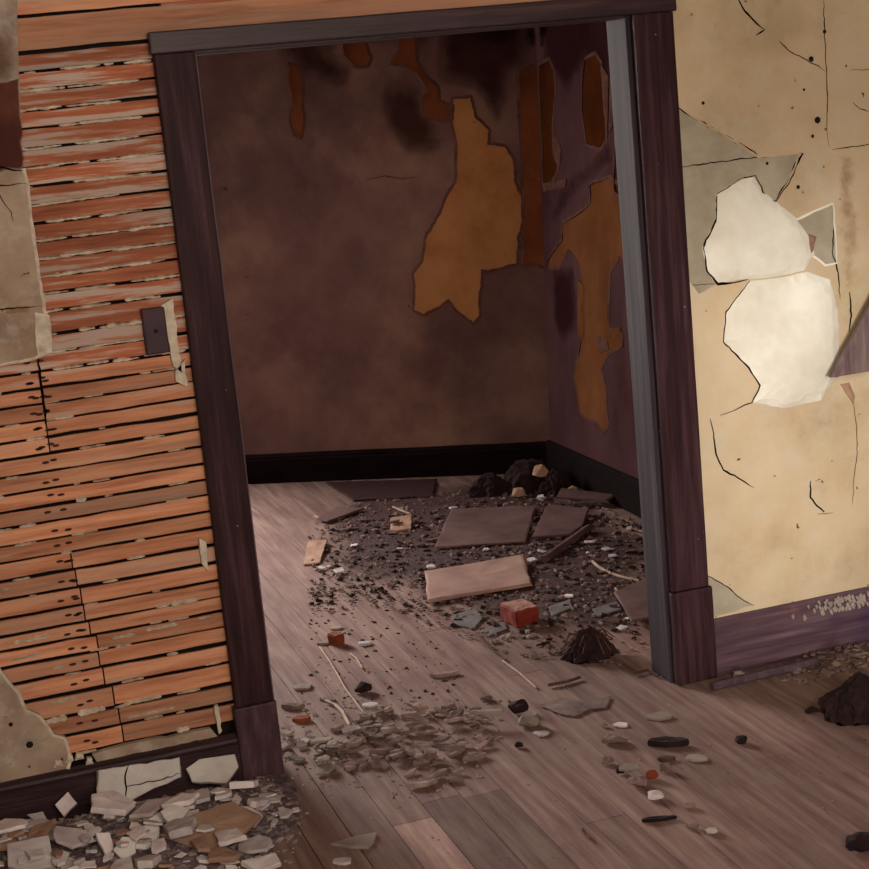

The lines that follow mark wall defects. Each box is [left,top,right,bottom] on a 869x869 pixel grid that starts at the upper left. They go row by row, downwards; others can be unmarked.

spalling [17,3,158,19]
spalling [18,39,148,56]
crack [738,0,869,150]
crack [679,108,761,167]
peeling [679,105,800,296]
peeling [797,203,837,266]
spalling [0,163,199,462]
spalling [0,445,201,479]
spalling [2,462,204,497]
spalling [0,479,206,514]
spalling [95,510,210,532]
spalling [0,526,235,769]